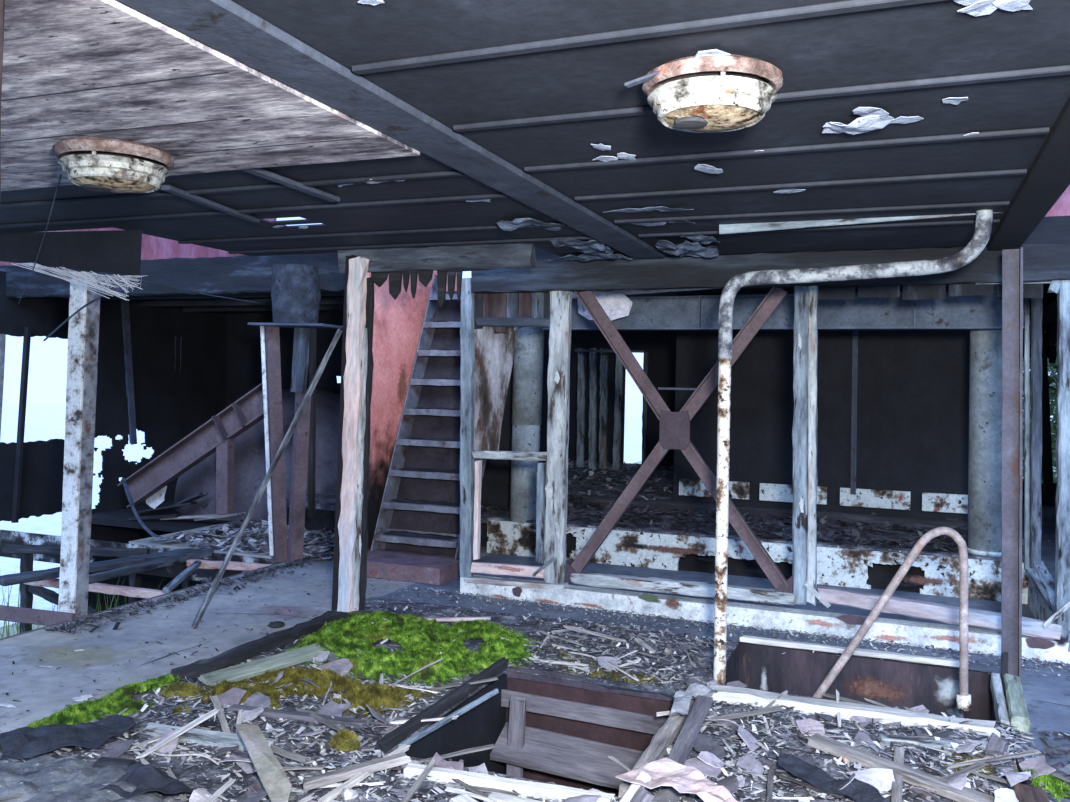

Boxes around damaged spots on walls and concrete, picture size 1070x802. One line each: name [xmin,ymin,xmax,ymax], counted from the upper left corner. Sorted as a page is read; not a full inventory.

peeling [954,0,1033,16]
peeling [822,107,924,135]
peeling [591,143,636,162]
peeling [694,164,723,174]
rust [632,544,713,562]